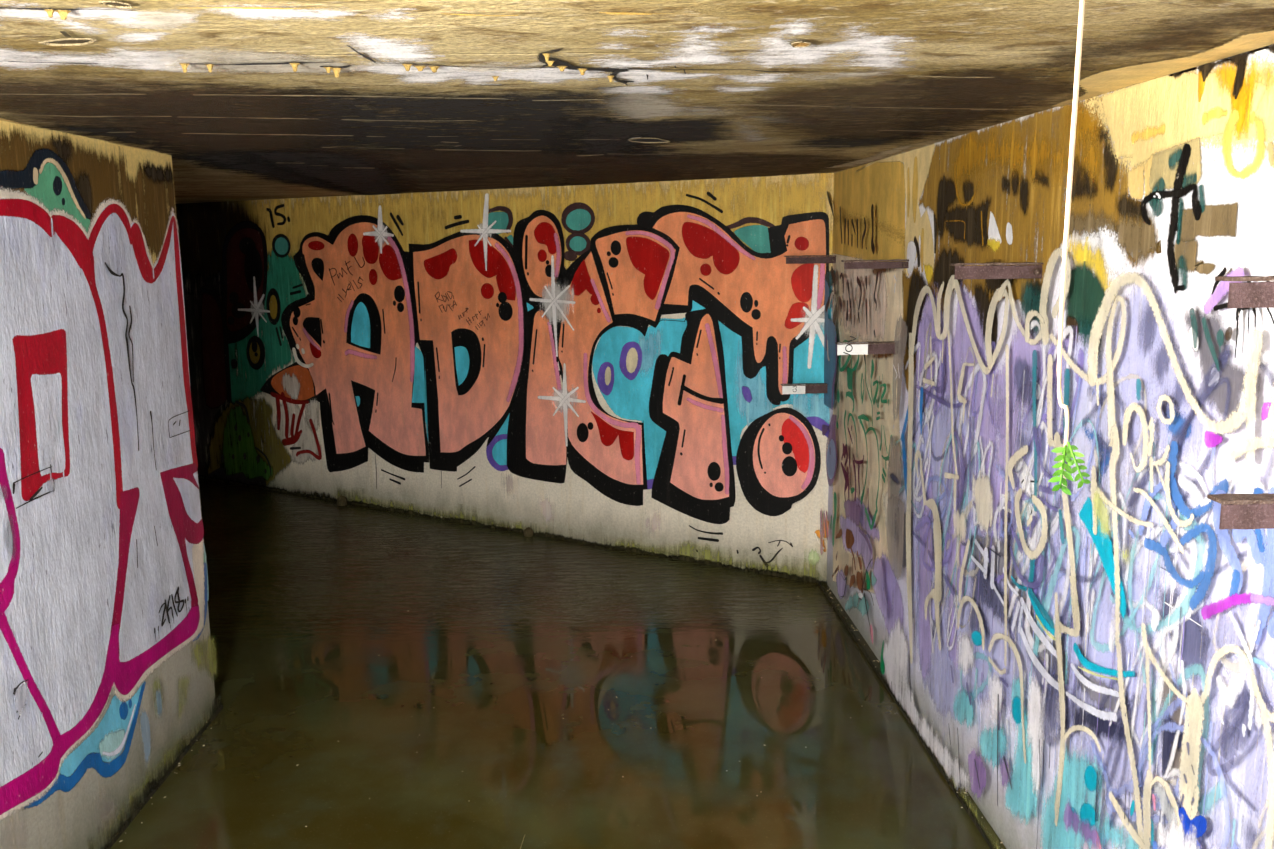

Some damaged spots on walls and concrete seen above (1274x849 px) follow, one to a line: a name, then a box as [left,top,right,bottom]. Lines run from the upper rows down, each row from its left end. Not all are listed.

crack [8,58,98,66]
crack [179,45,461,78]
damp [0,5,910,118]
crack [491,48,820,88]